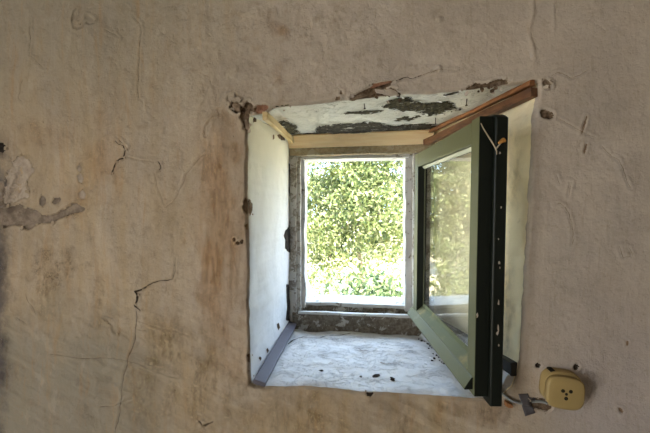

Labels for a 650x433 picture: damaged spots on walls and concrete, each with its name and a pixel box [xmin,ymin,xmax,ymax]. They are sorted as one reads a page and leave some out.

flaking render [227,93,291,133]
peeling [273,75,513,141]
flaking render [0,153,87,231]
crack [112,140,204,205]
crack [51,259,188,431]